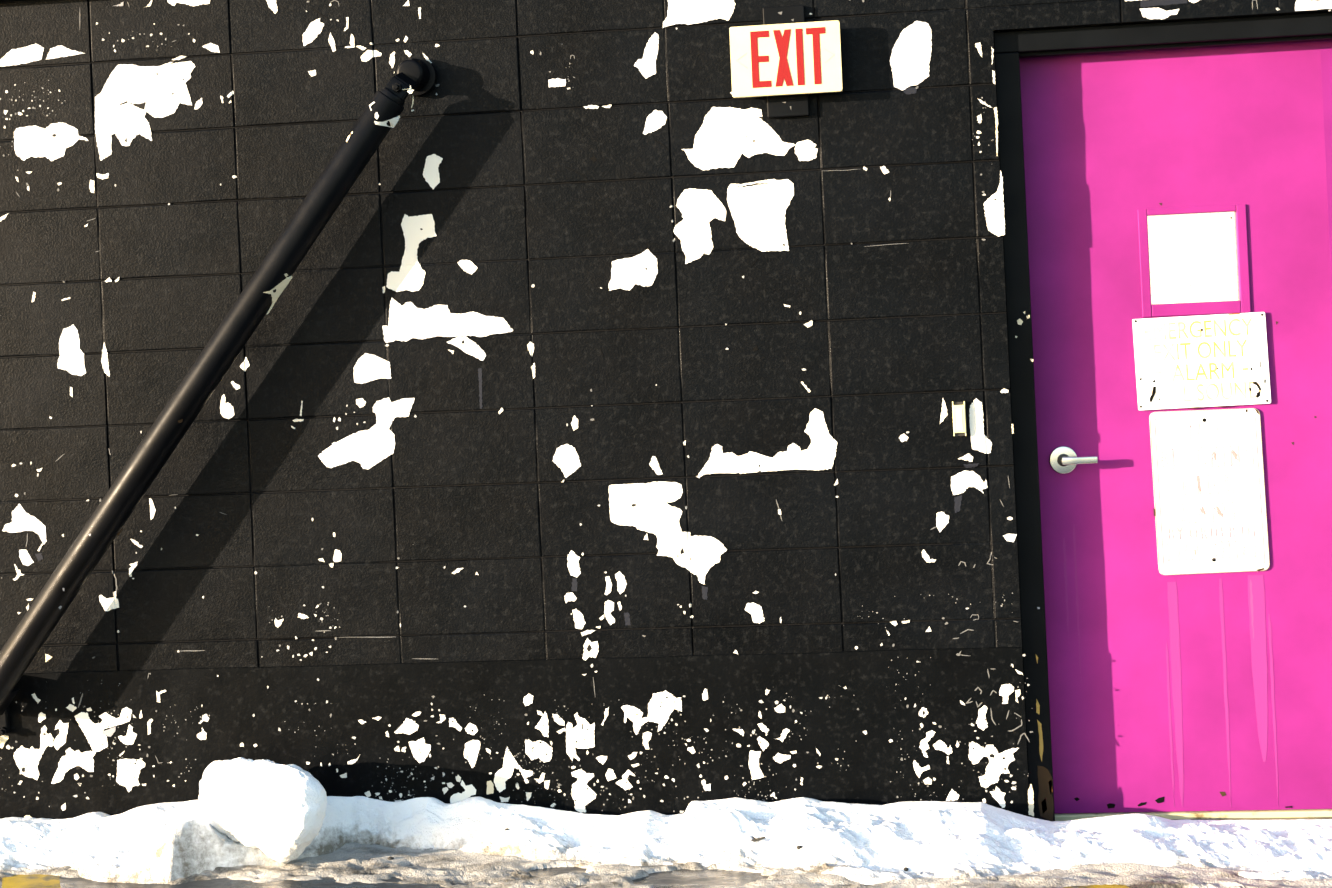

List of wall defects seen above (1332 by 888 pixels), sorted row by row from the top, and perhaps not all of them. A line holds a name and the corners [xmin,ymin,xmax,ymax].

peeling [634,0,735,78]
peeling [890,21,932,90]
peeling [14,56,203,193]
peeling [681,107,818,170]
peeling [673,179,794,264]
peeling [382,214,511,361]
peeling [318,353,415,470]
peeling [697,408,838,486]
peeling [609,456,727,584]
peeling [0,693,153,792]
peeling [437,690,682,813]
peeling [960,664,1023,808]